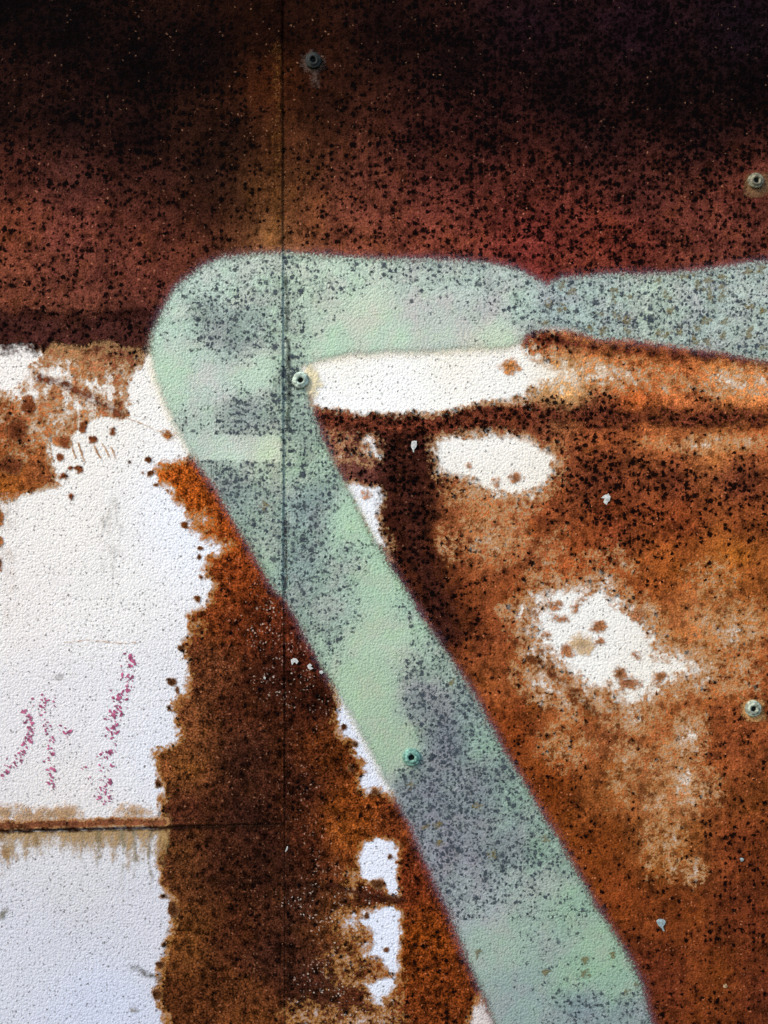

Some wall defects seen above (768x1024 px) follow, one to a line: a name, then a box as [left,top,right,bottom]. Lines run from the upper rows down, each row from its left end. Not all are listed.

corrosion [0,0,768,545]
corrosion [0,454,496,1024]
corrosion [304,329,768,1024]